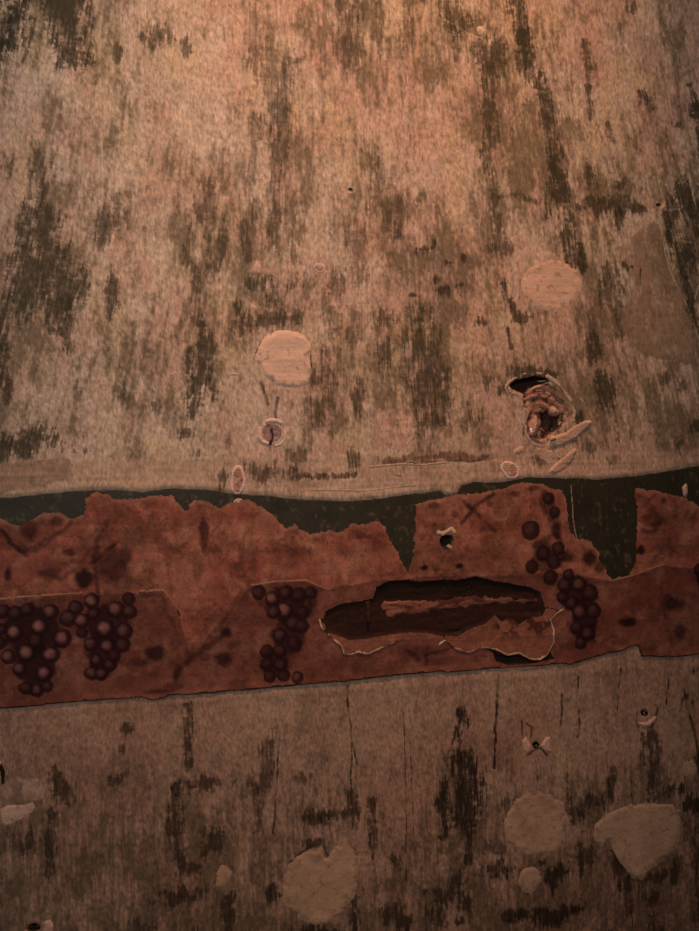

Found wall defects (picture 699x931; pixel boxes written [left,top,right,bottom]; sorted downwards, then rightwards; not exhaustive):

water stain [0,0,93,70]
water stain [446,0,647,275]
water stain [0,195,88,405]
water stain [500,281,529,350]
water stain [661,175,699,328]
peeling [0,491,87,525]
water stain [180,317,219,438]
peeling [105,489,418,572]
spalling [258,418,286,447]
peeling [461,364,699,580]
spalling [521,720,552,755]
water stain [424,707,508,929]